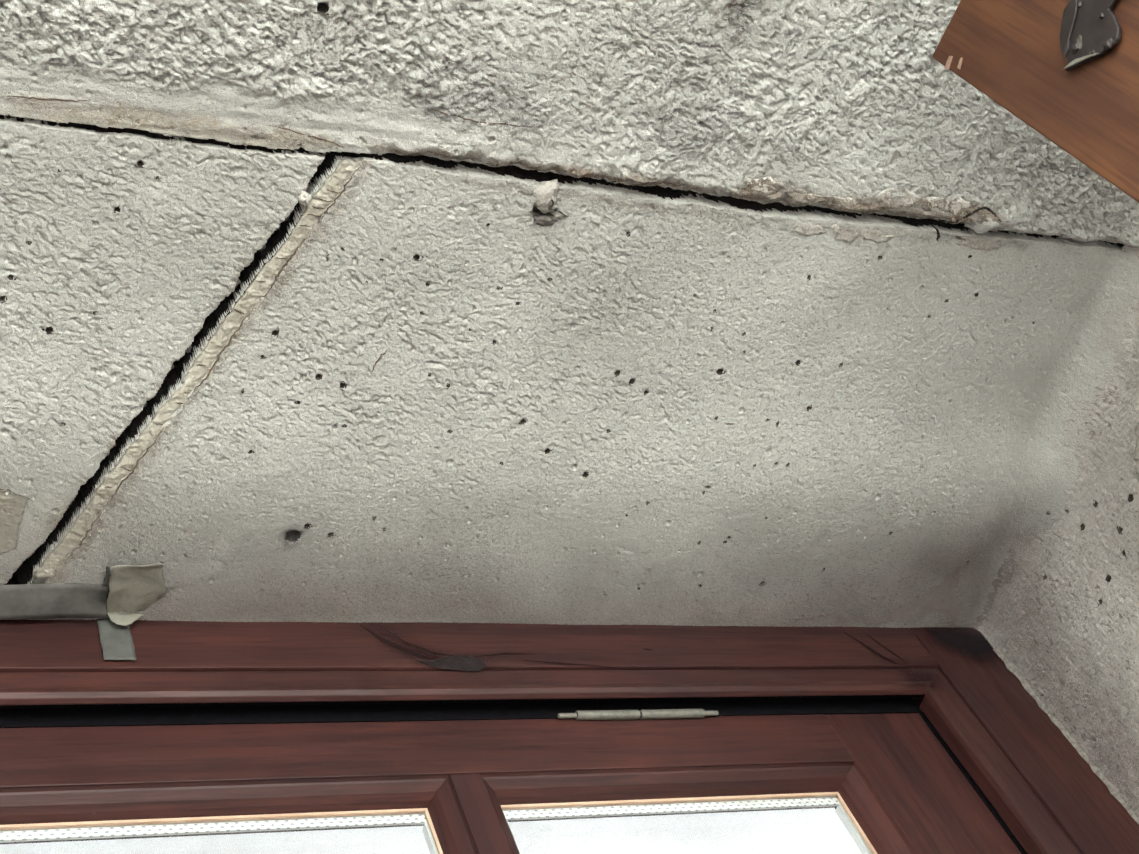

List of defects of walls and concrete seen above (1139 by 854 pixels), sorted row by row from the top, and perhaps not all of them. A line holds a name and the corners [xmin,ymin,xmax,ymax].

crack [0,96,1059,585]